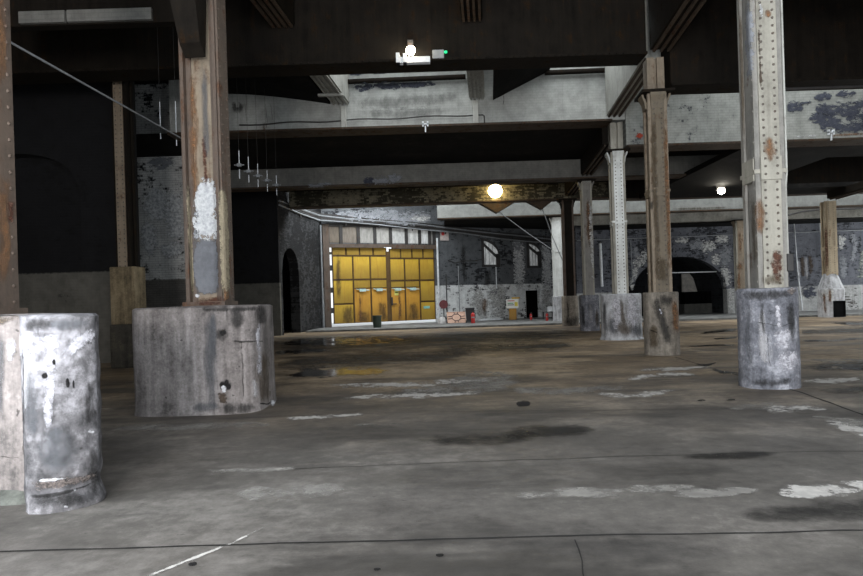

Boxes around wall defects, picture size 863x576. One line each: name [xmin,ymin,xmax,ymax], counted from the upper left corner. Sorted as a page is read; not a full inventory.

peeling [135,83,170,134]
peeling [787,90,863,135]
peeling [137,156,230,308]
corrosion [752,202,765,260]
corrosion [765,252,782,283]
peeling [839,234,863,279]